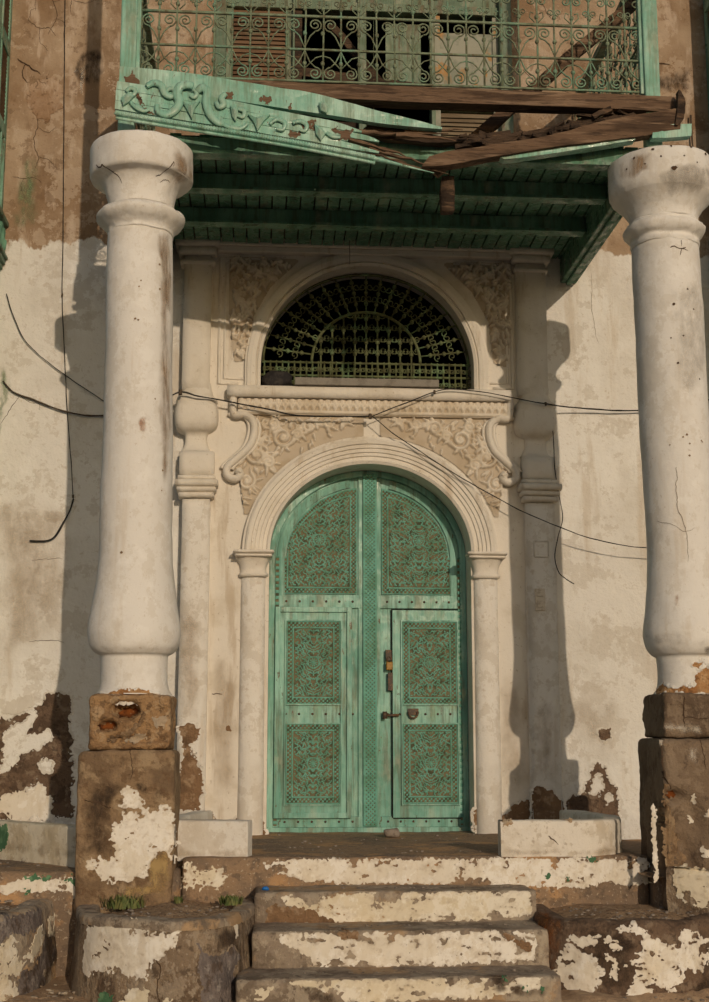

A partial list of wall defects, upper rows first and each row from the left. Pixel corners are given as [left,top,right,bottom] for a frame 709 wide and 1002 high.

crack [18,0,94,82]
water stain [76,52,100,81]
crack [18,120,57,197]
crack [658,471,694,557]
peeling [653,658,709,695]
peeling [0,689,76,823]
peeling [85,687,228,892]
peeling [499,761,622,827]
peeling [0,872,75,898]
peeling [263,784,709,1002]
flaking render [0,906,56,1002]
peeling [82,917,181,1002]